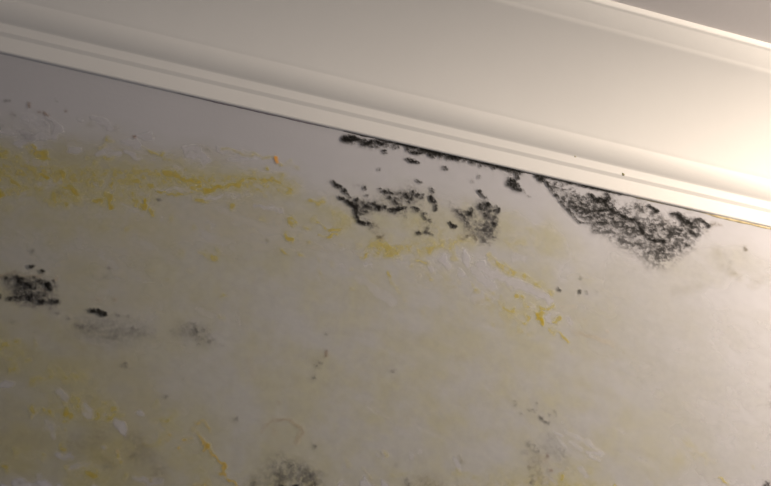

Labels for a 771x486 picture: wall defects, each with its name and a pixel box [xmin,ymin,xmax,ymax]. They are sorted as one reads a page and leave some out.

damp [0,135,760,486]